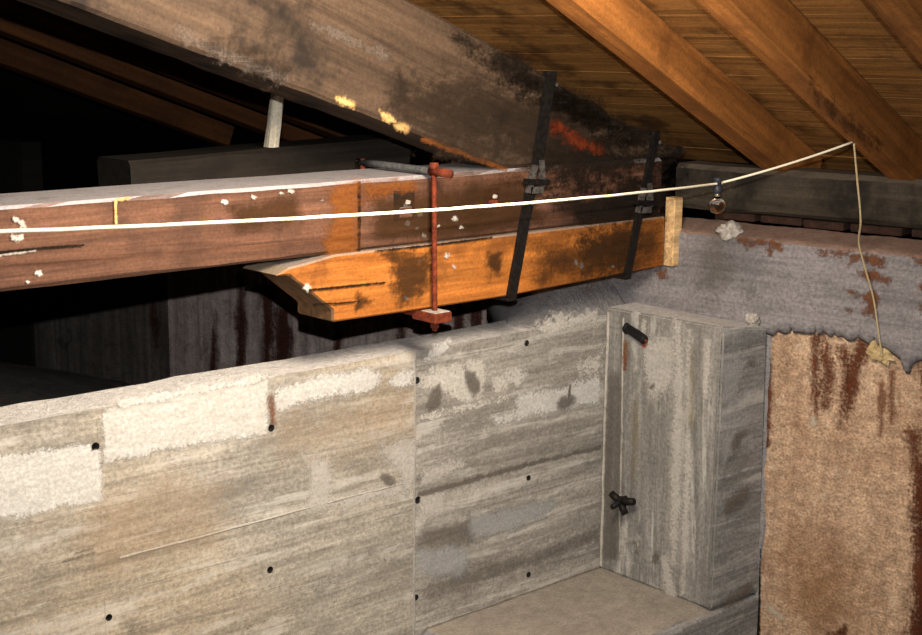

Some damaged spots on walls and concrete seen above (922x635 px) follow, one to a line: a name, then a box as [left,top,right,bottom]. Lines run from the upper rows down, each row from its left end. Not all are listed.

rust [551,122,601,155]
rust [738,237,783,257]
rust [819,250,891,317]
efflorescence [535,308,599,339]
rust [810,333,869,420]
flaking render [866,340,895,366]
leakage [0,339,604,521]
rust [903,426,922,635]